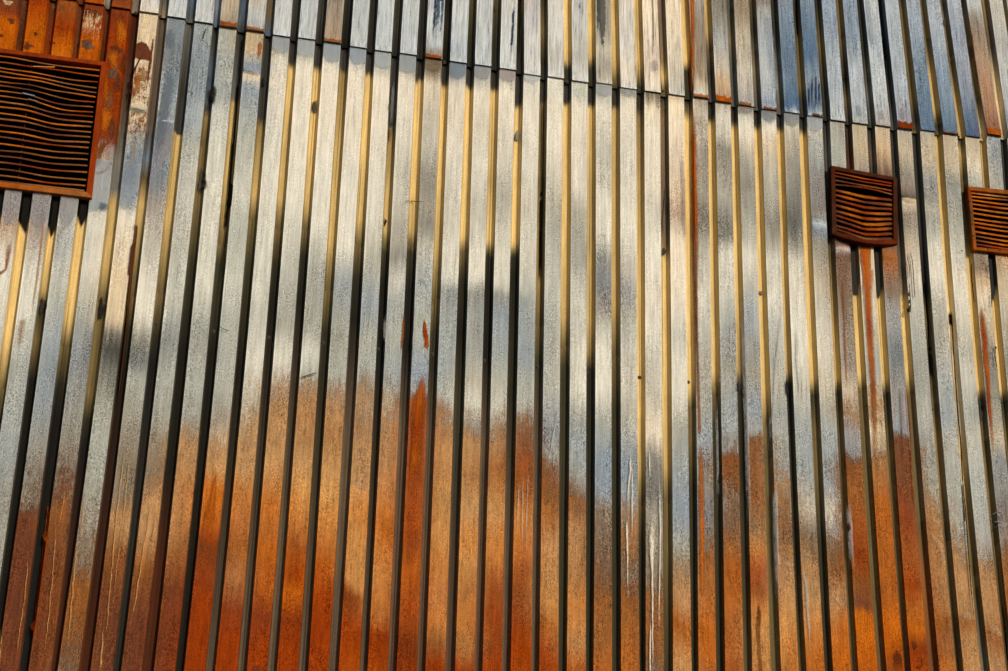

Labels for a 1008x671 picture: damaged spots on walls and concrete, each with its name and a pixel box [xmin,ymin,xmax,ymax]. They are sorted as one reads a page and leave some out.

rust [0,0,133,145]
rust [687,0,752,106]
rust [33,220,44,301]
rust [690,120,701,434]
rust [0,246,1008,671]